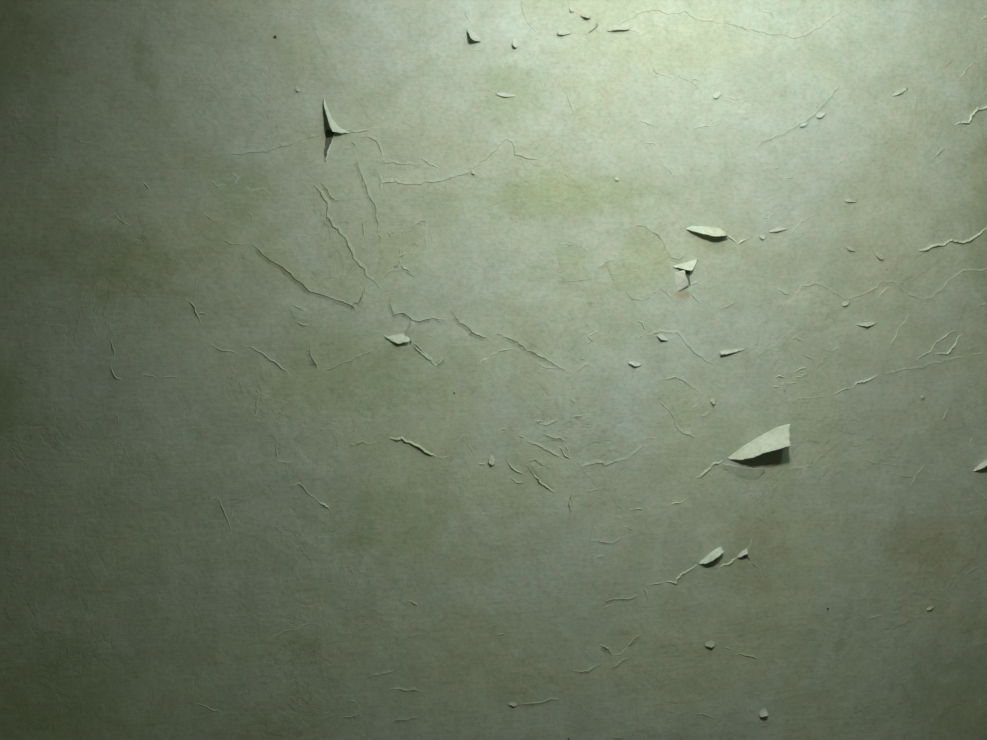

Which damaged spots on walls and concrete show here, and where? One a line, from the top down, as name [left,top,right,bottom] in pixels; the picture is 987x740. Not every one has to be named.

peeling [228,98,379,162]
crack [955,105,987,125]
crack [186,134,574,377]
peeling [685,226,787,260]
crack [918,227,987,251]
peeling [383,320,447,368]
crack [776,266,987,401]
crack [348,434,526,484]
crack [498,398,658,561]
peeling [695,424,791,480]
peeling [666,539,763,584]
crack [571,635,641,675]